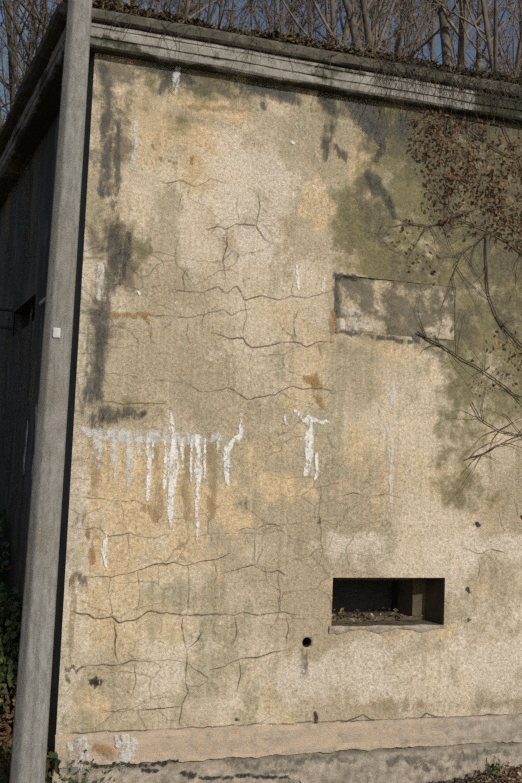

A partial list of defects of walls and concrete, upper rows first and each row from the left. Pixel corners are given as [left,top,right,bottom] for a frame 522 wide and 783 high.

water stain [99,64,121,196]
water stain [318,90,410,162]
water stain [83,218,147,429]
crack [154,194,332,372]
water stain [333,273,440,344]
crack [155,379,332,408]
rust [304,374,324,407]
water stain [146,413,206,539]
water stain [216,413,243,486]
crack [319,480,398,561]
crack [71,497,295,734]
crack [268,712,522,725]